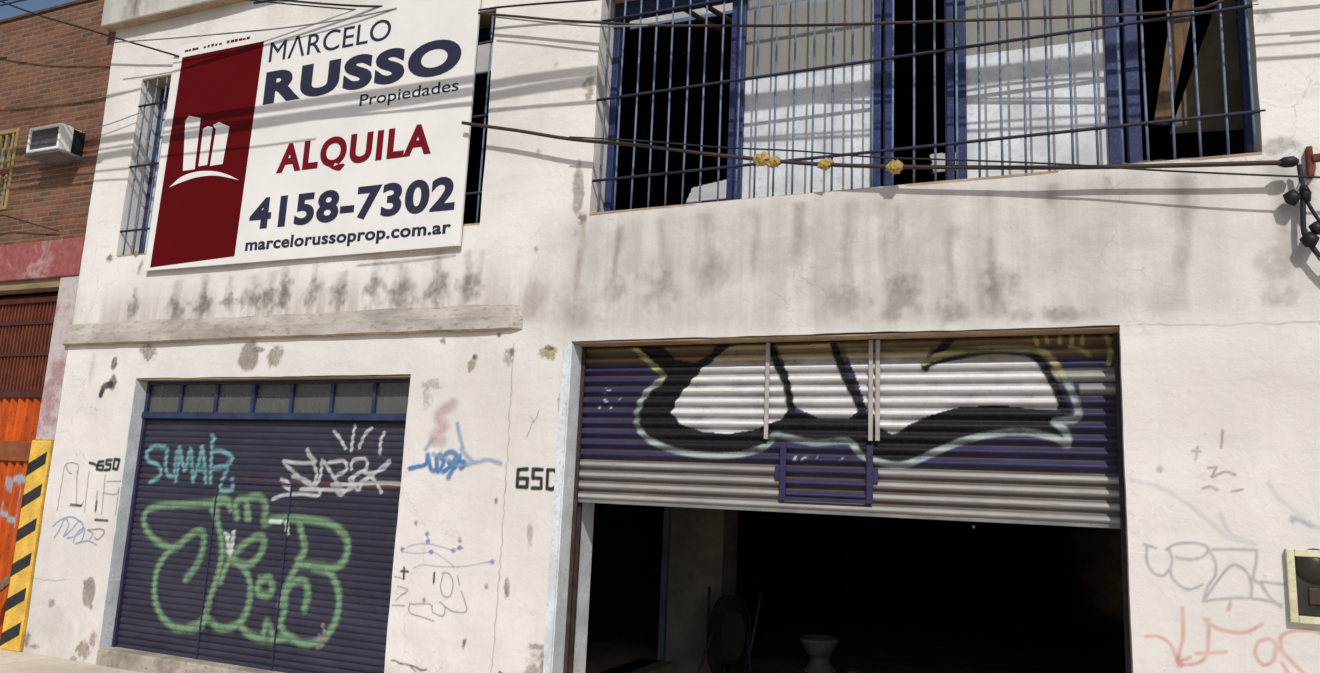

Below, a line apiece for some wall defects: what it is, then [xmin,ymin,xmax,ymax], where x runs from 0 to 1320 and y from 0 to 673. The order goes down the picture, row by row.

spalling [239,342,283,370]